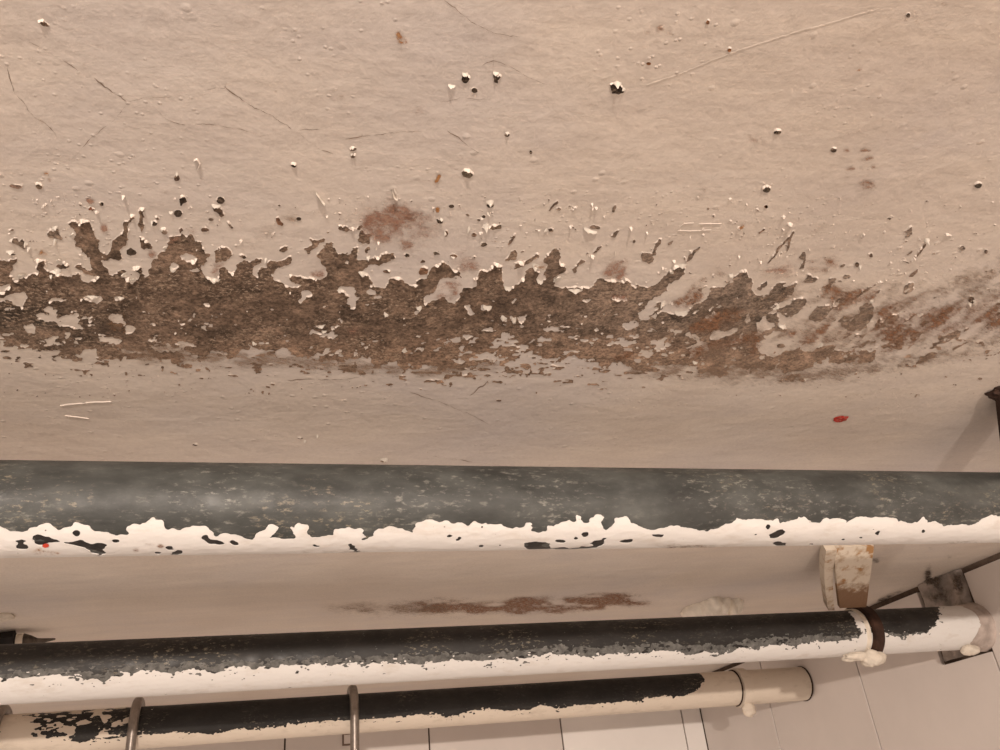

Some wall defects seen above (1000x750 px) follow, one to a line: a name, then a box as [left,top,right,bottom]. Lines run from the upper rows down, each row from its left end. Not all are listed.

peeling [0,185,1000,396]
spalling [16,530,119,553]
spalling [202,535,238,545]
spalling [526,532,606,549]
spalling [755,524,786,545]
rust [389,594,646,614]